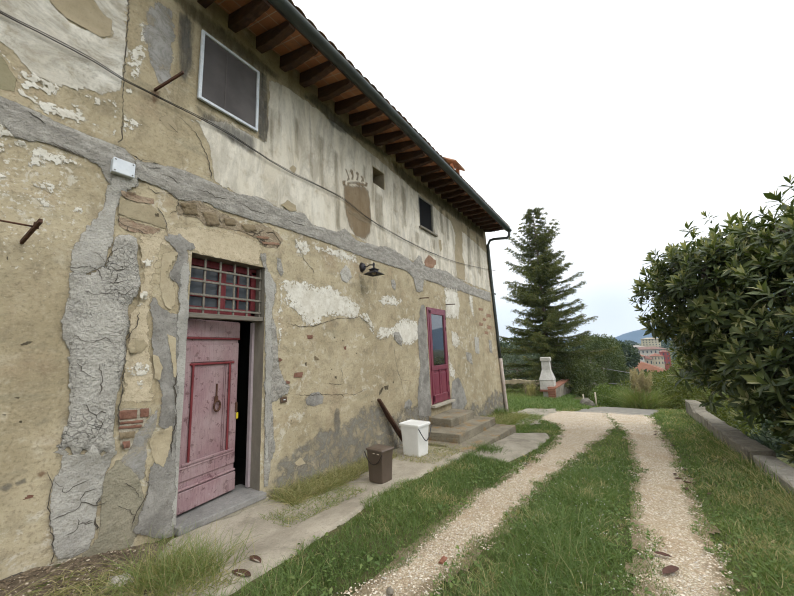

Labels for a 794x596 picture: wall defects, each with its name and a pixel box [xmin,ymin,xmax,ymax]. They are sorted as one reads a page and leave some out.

peeling [0,0,147,135]
peeling [0,124,82,167]
crack [118,0,179,234]
crack [169,118,224,199]
peeling [191,80,490,291]
crack [71,248,133,295]
spalling [118,190,283,450]
peeling [278,280,418,348]
peeling [444,287,460,319]
crack [170,373,178,453]
crack [45,363,150,562]
spalling [82,460,145,557]